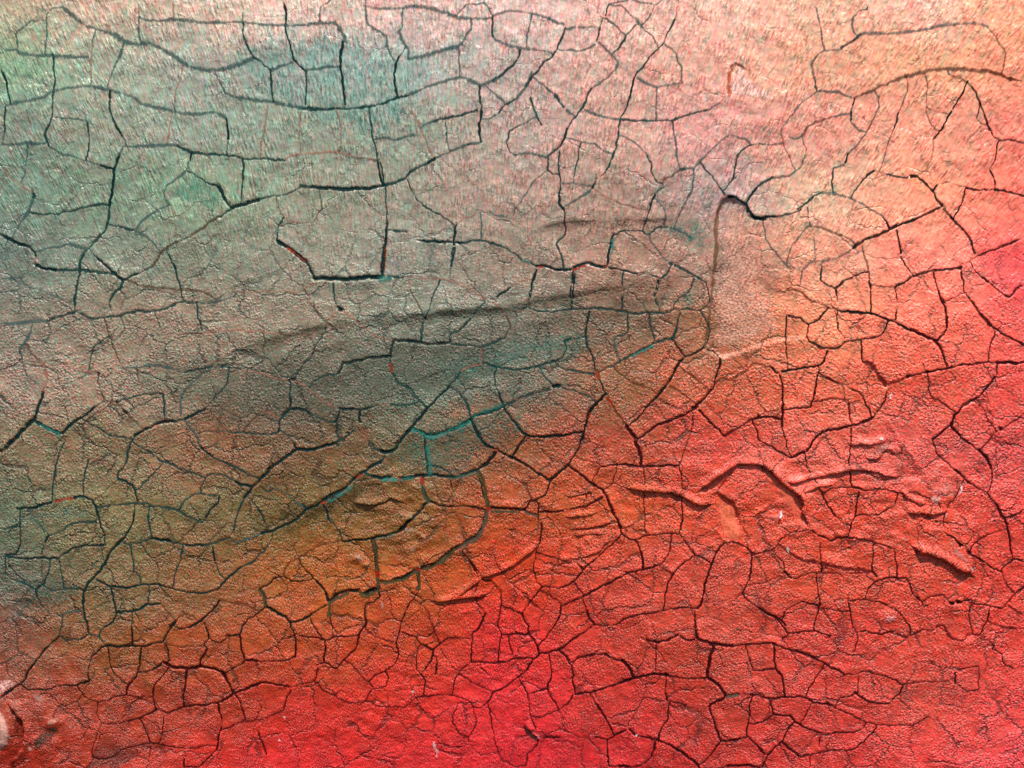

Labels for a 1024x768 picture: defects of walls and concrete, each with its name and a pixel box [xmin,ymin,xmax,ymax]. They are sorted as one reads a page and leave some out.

crack [1,0,791,380]
crack [728,27,1024,269]
crack [832,6,1000,51]
crack [1,245,1024,768]